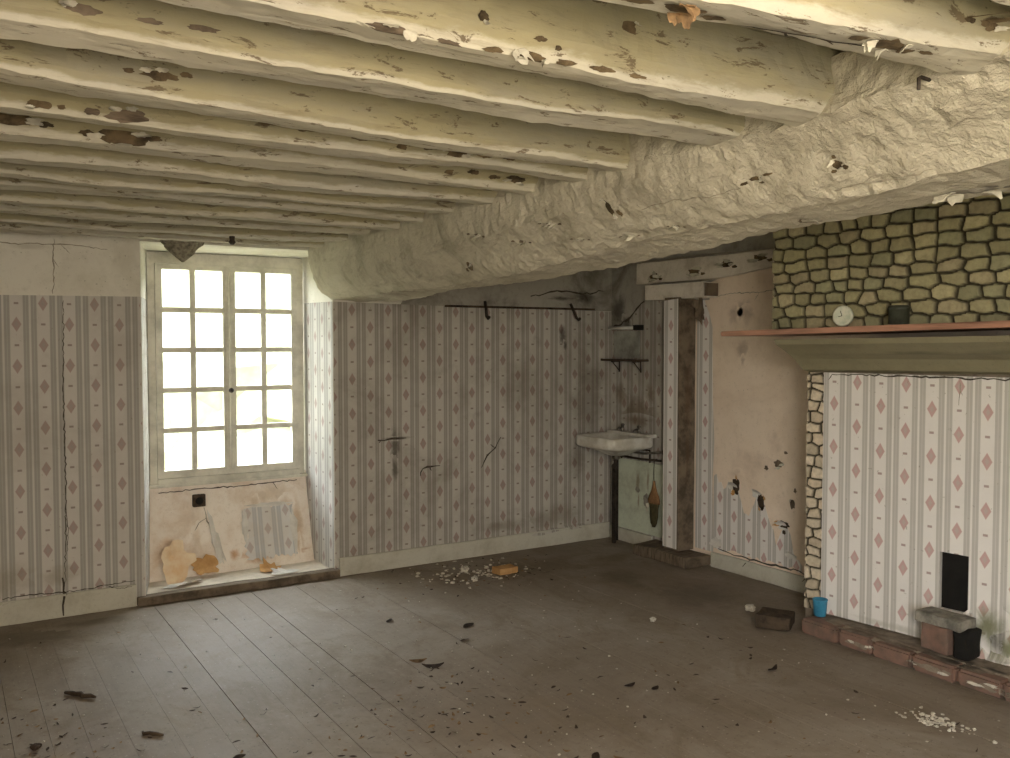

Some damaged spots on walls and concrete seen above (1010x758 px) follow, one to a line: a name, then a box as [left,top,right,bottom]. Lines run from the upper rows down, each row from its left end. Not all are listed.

peeling [356,21,417,42]
peeling [478,10,490,25]
peeling [622,21,641,35]
peeling [626,0,726,30]
peeling [965,12,1010,32]
peeling [481,36,577,67]
peeling [848,36,933,60]
peeling [122,67,193,81]
peeling [589,65,616,73]
peeling [0,99,66,128]
peeling [78,106,162,148]